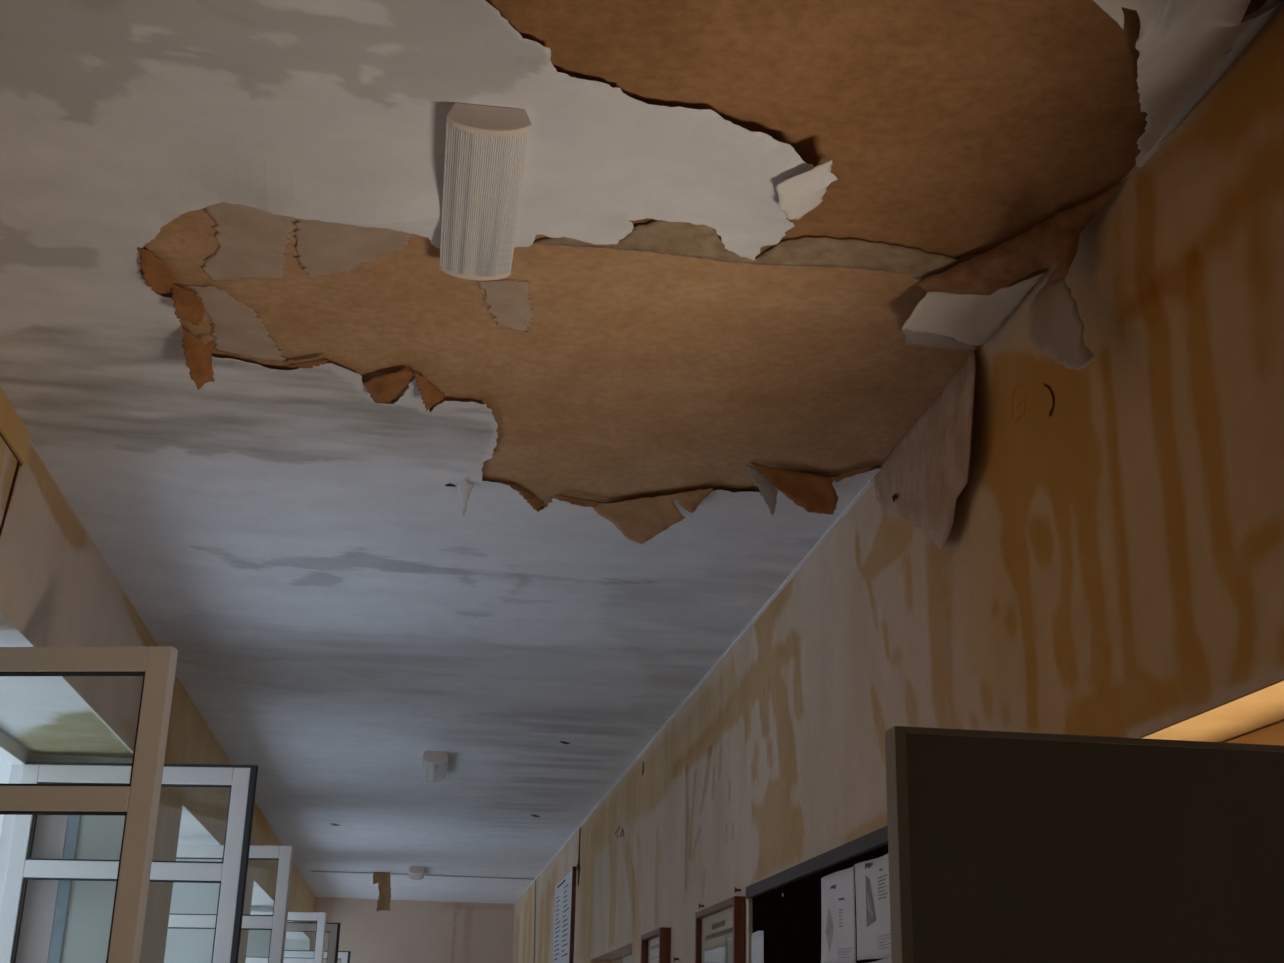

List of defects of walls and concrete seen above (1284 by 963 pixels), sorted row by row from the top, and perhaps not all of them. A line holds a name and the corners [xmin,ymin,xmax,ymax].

peeling [137,0,1148,549]